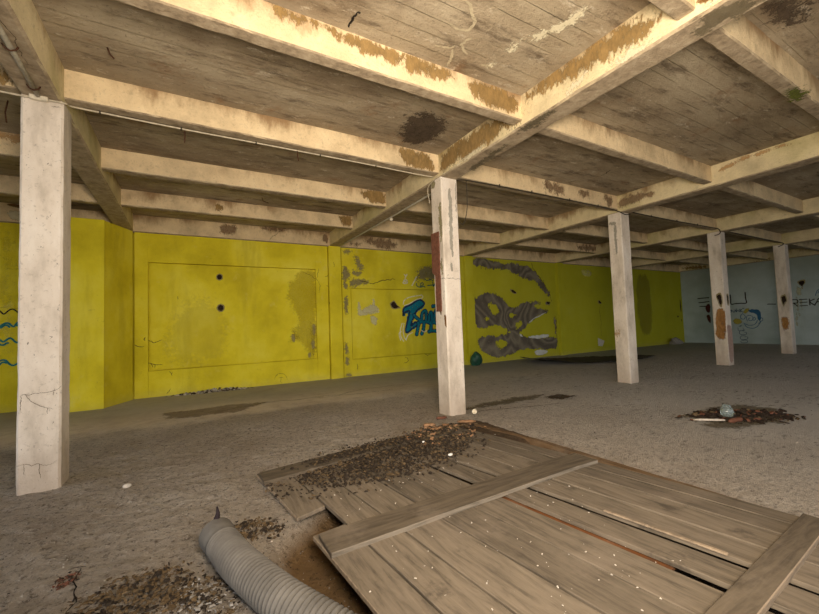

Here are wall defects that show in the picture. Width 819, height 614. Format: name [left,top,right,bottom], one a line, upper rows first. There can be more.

damp [691,0,816,36]
damp [526,12,662,100]
damp [398,109,556,174]
rust [431,231,447,327]
rust [715,308,726,340]